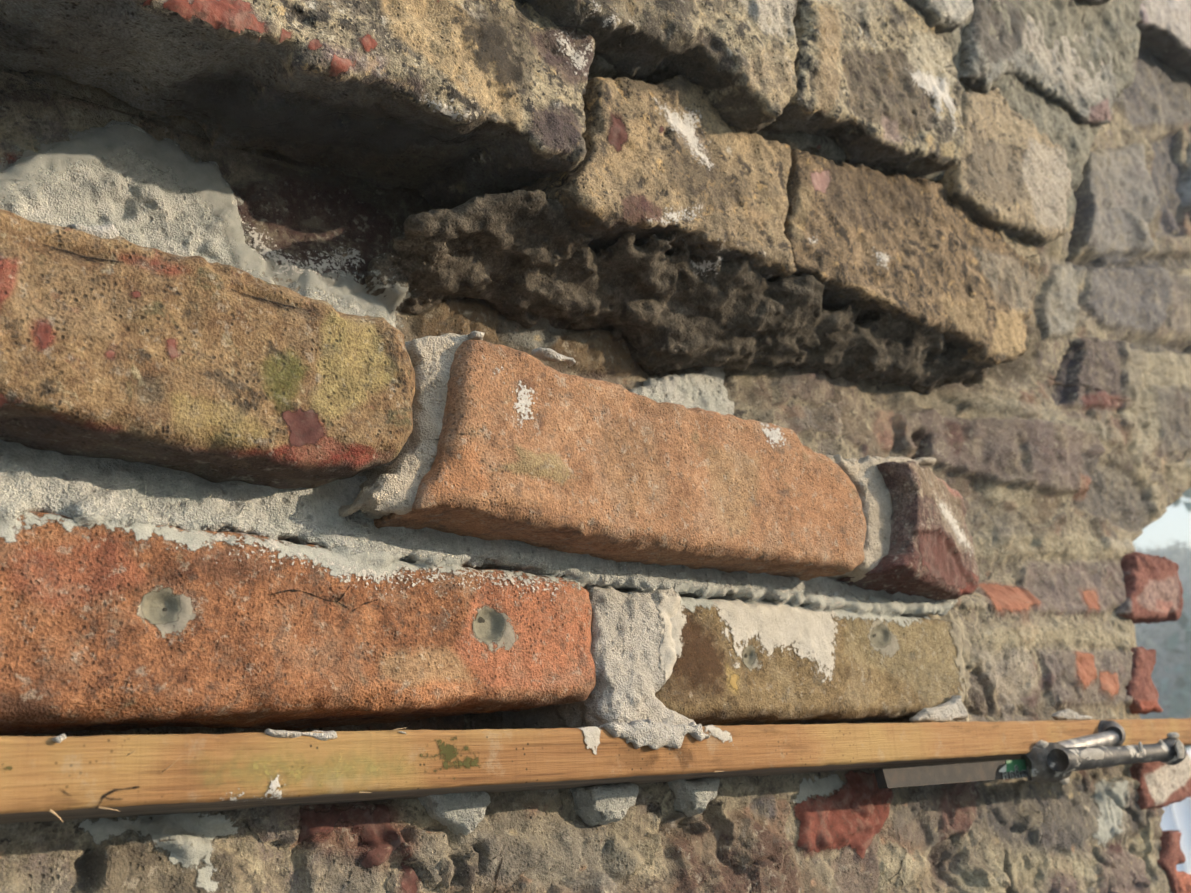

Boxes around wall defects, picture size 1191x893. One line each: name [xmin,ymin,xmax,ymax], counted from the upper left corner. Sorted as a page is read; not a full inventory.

spalling [1115,552,1183,624]
spalling [1076,646,1163,714]